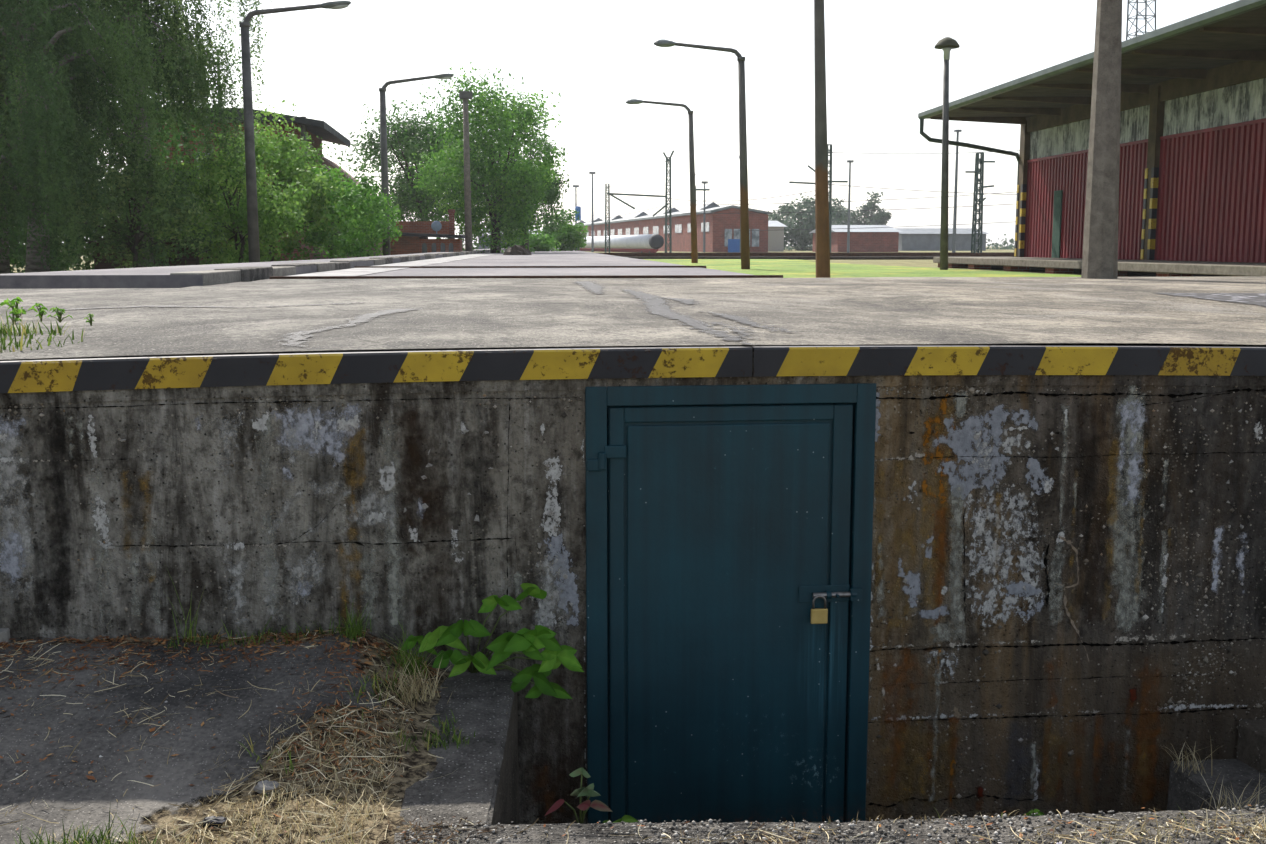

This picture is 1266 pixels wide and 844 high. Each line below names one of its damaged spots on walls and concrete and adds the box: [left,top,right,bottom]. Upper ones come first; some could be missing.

damp [0,418,69,624]
damp [56,415,98,459]
damp [229,562,247,622]
damp [252,406,360,478]
damp [284,409,449,626]
spalling [434,390,585,472]
peeling [497,446,579,627]
corrosion [876,394,956,621]
damp [1049,532,1065,617]
peeling [873,386,1266,799]
damp [1062,386,1147,629]
damp [1161,529,1171,612]